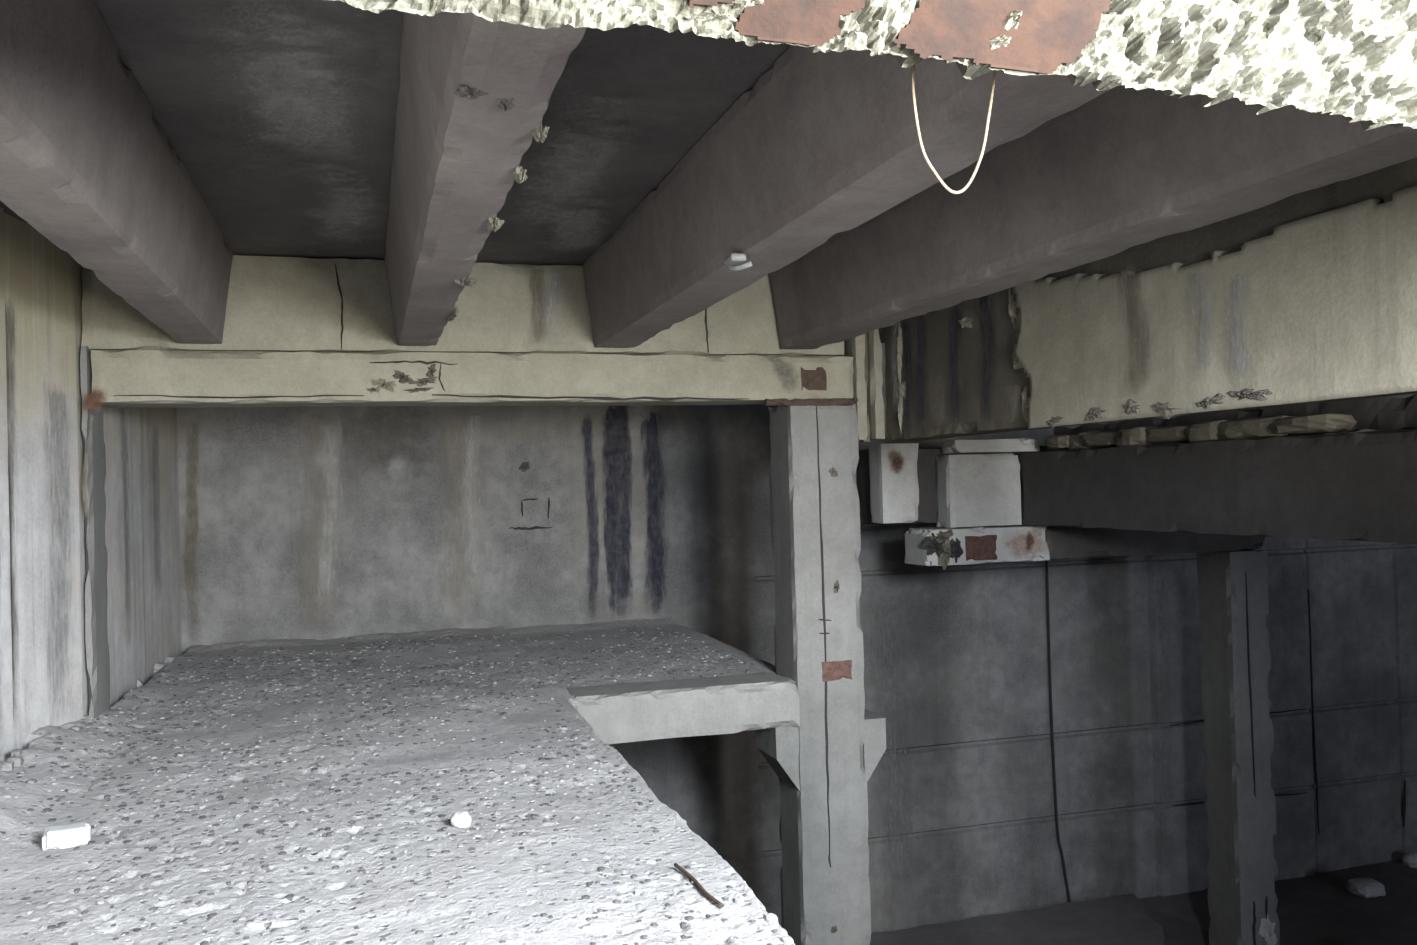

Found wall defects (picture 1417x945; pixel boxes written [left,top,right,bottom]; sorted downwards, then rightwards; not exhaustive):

rust [685,0,866,47]
rust [894,0,1111,74]
water stain [5,309,17,668]
water stain [51,393,69,682]
water stain [582,406,664,610]